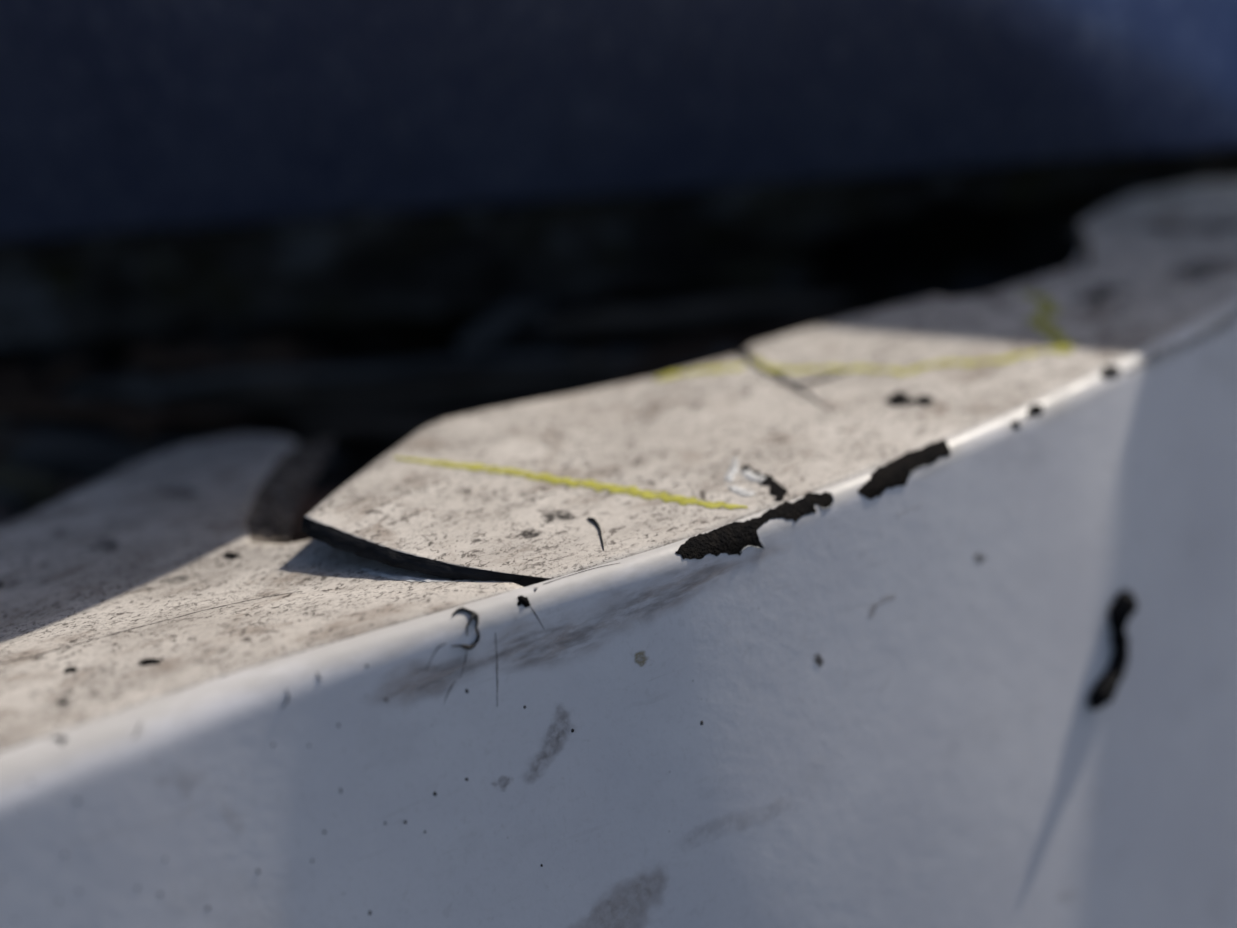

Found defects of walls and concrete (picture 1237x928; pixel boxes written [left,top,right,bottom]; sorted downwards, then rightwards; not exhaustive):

peeling [885,390,935,407]
peeling [1011,404,1043,429]
peeling [1099,366,1121,381]
spalling [247,437,335,543]
peeling [675,458,835,560]
peeling [858,438,951,500]
crack [302,516,618,585]
peeling [137,658,164,666]